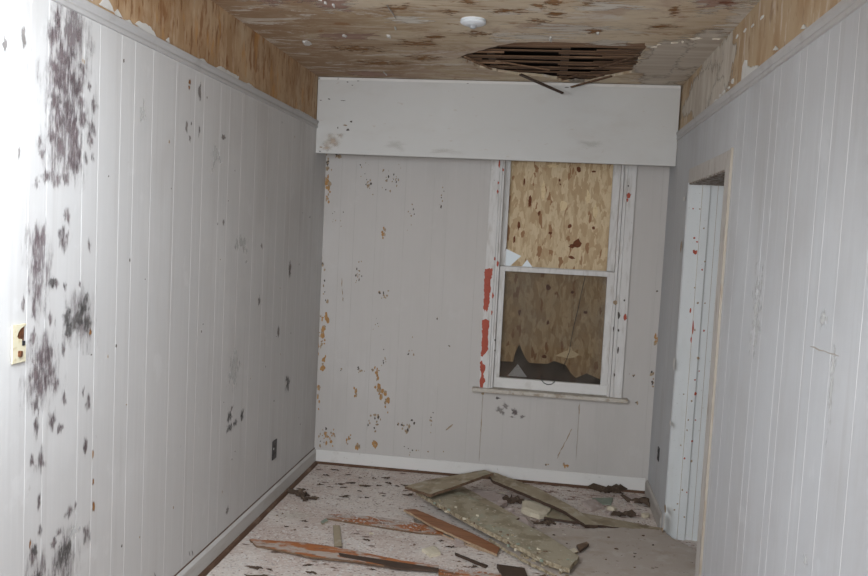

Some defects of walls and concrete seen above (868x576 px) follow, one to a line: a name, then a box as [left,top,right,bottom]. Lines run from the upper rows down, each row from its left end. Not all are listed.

water stain [382,3,434,23]
water stain [445,0,649,46]
water stain [648,5,680,29]
water stain [316,33,444,77]
water stain [35,11,96,185]
water stain [22,227,65,317]
water stain [64,283,91,337]
peeling [318,262,329,371]
water stain [29,315,66,434]
peeling [357,349,390,449]
peeling [318,427,360,450]
water stain [31,530,71,576]